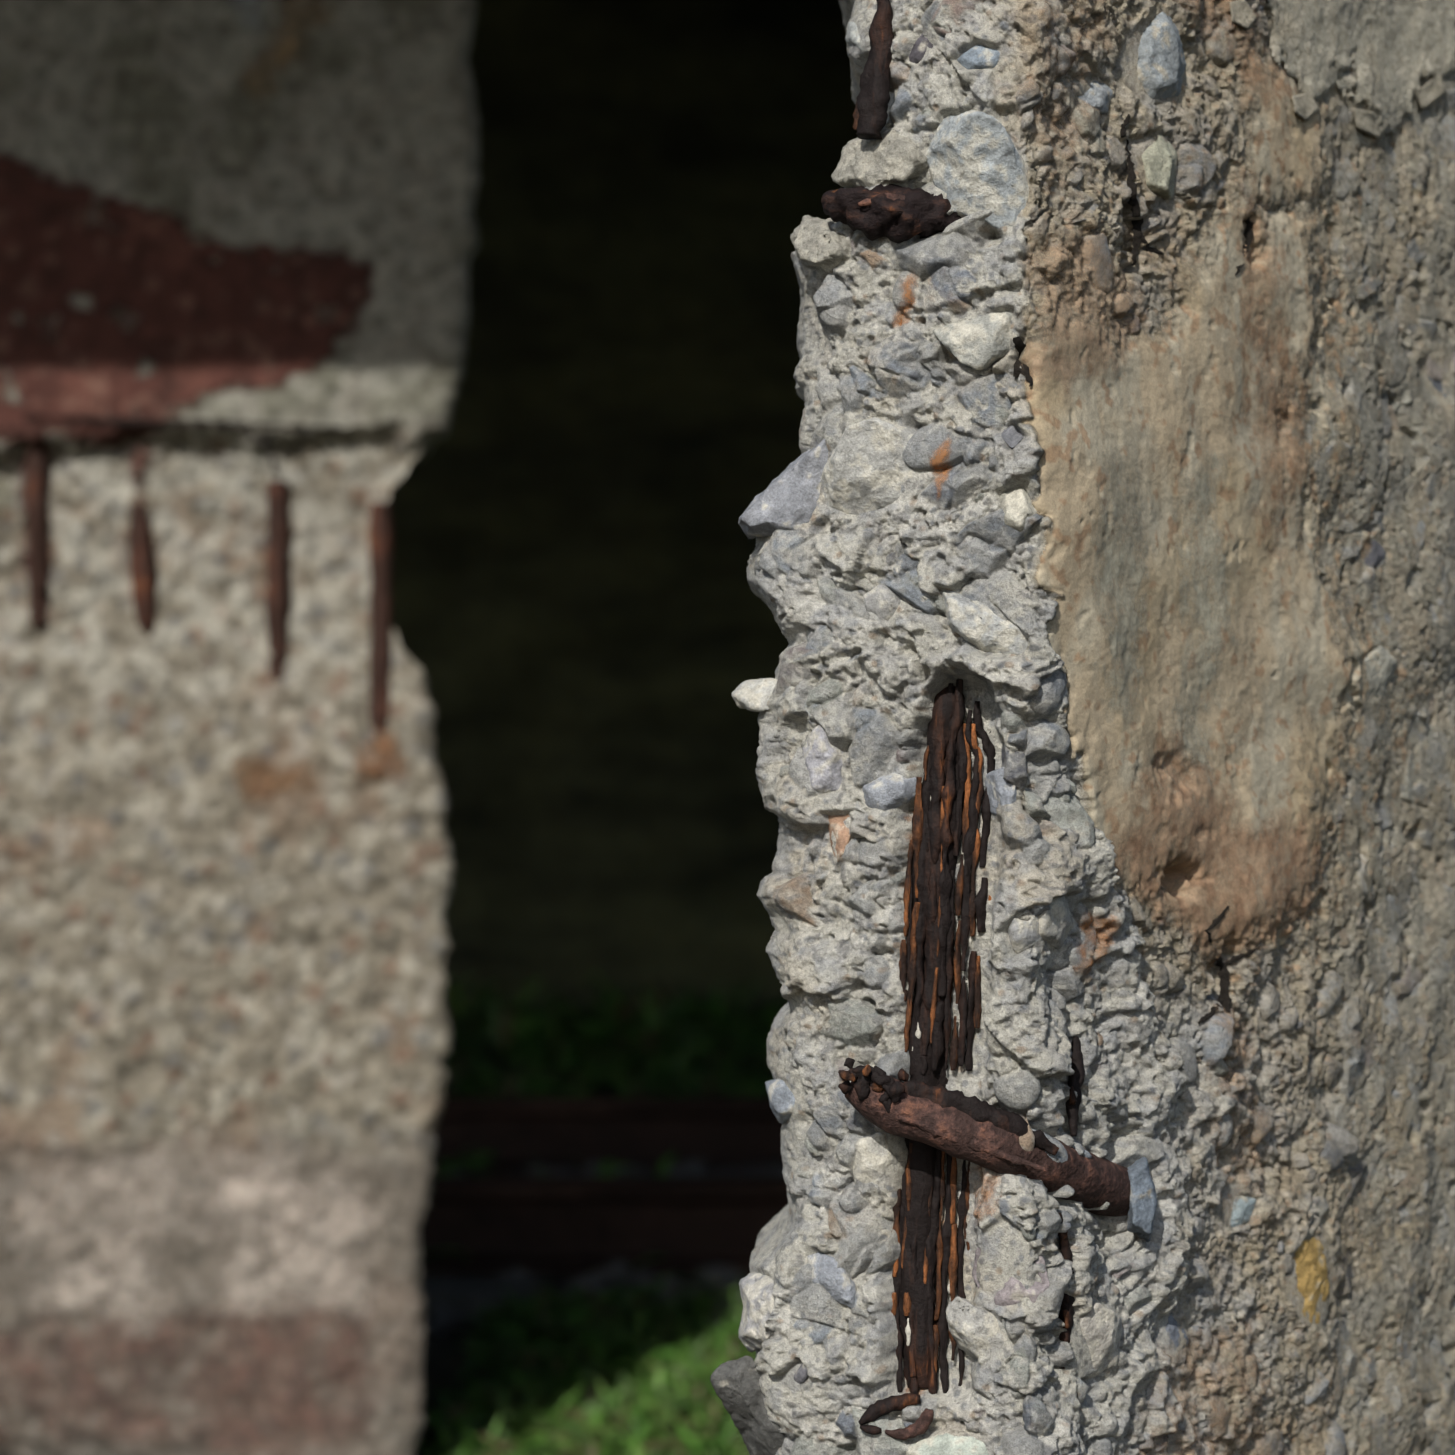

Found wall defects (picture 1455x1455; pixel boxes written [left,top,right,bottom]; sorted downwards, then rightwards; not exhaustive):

peeling [1230,0,1455,139]
crack [1120,114,1164,266]
corrosion [0,153,374,577]
spalling [710,0,1283,1455]
crack [1198,906,1255,1025]